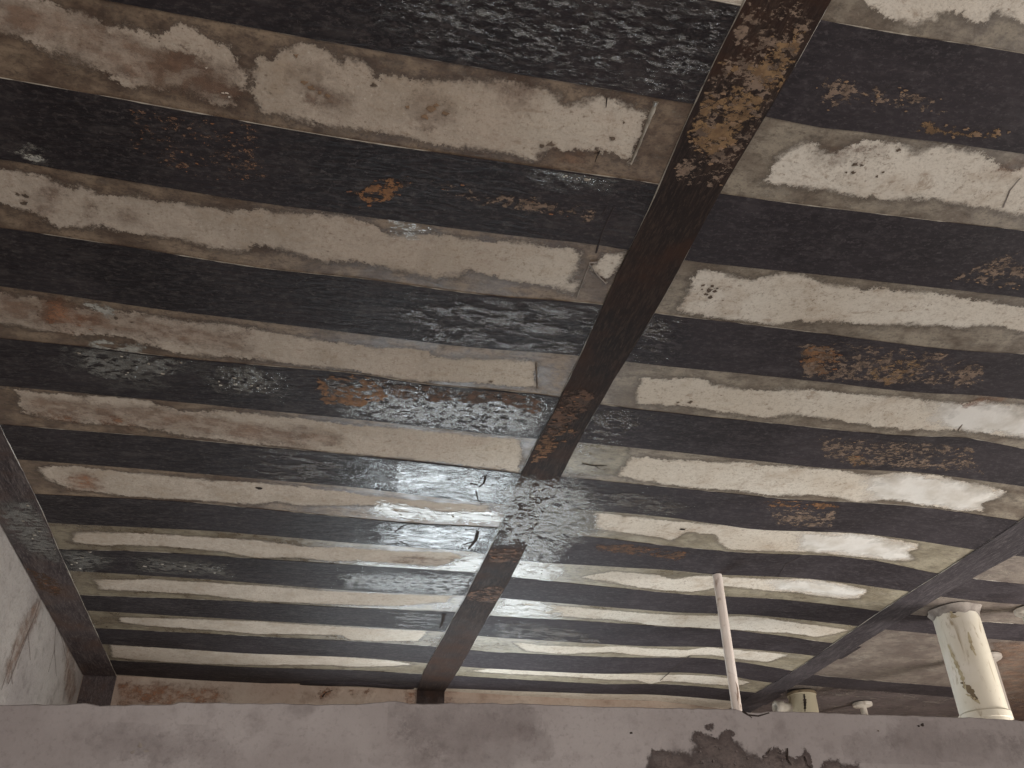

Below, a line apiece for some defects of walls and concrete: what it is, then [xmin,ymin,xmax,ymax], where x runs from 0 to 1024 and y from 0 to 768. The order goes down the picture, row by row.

rust [674,1,813,188]
rust [816,78,1011,139]
rust [346,176,409,208]
rust [955,253,1024,290]
rust [799,342,984,388]
rust [315,375,594,465]
water stain [0,152,1024,646]
rust [819,438,984,474]
rust [766,501,837,527]
flaking render [646,723,859,768]